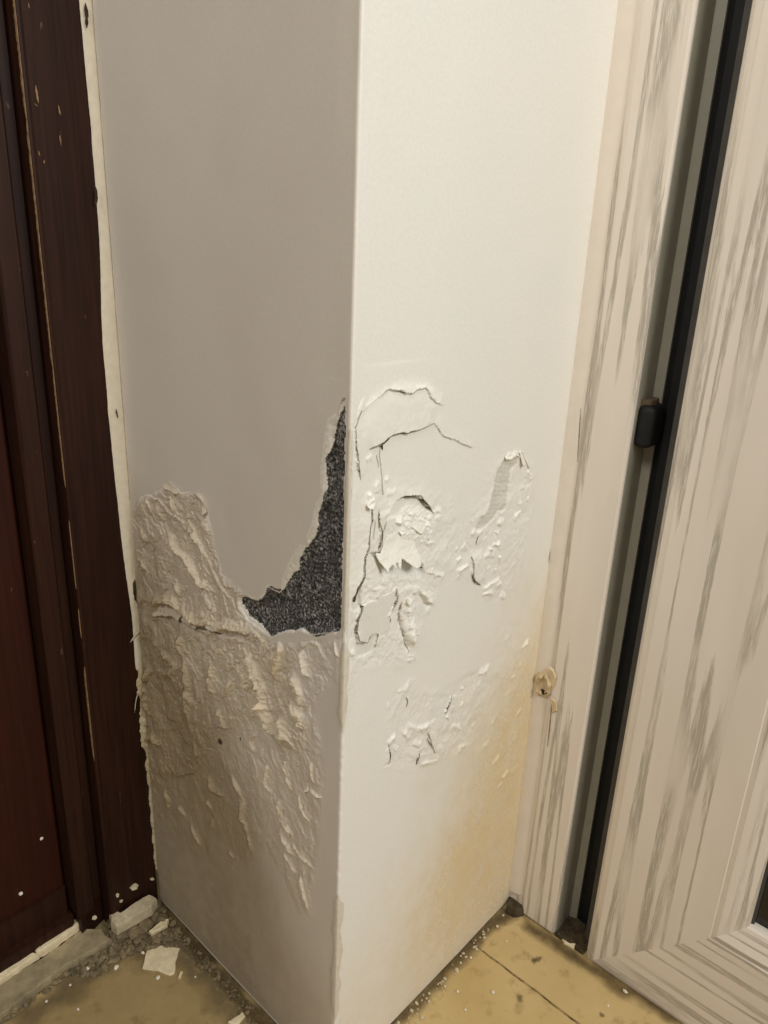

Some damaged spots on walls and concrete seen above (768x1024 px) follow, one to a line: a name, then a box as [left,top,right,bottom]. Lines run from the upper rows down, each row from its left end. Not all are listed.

spalling [129,392,539,922]
crack [353,412,471,651]